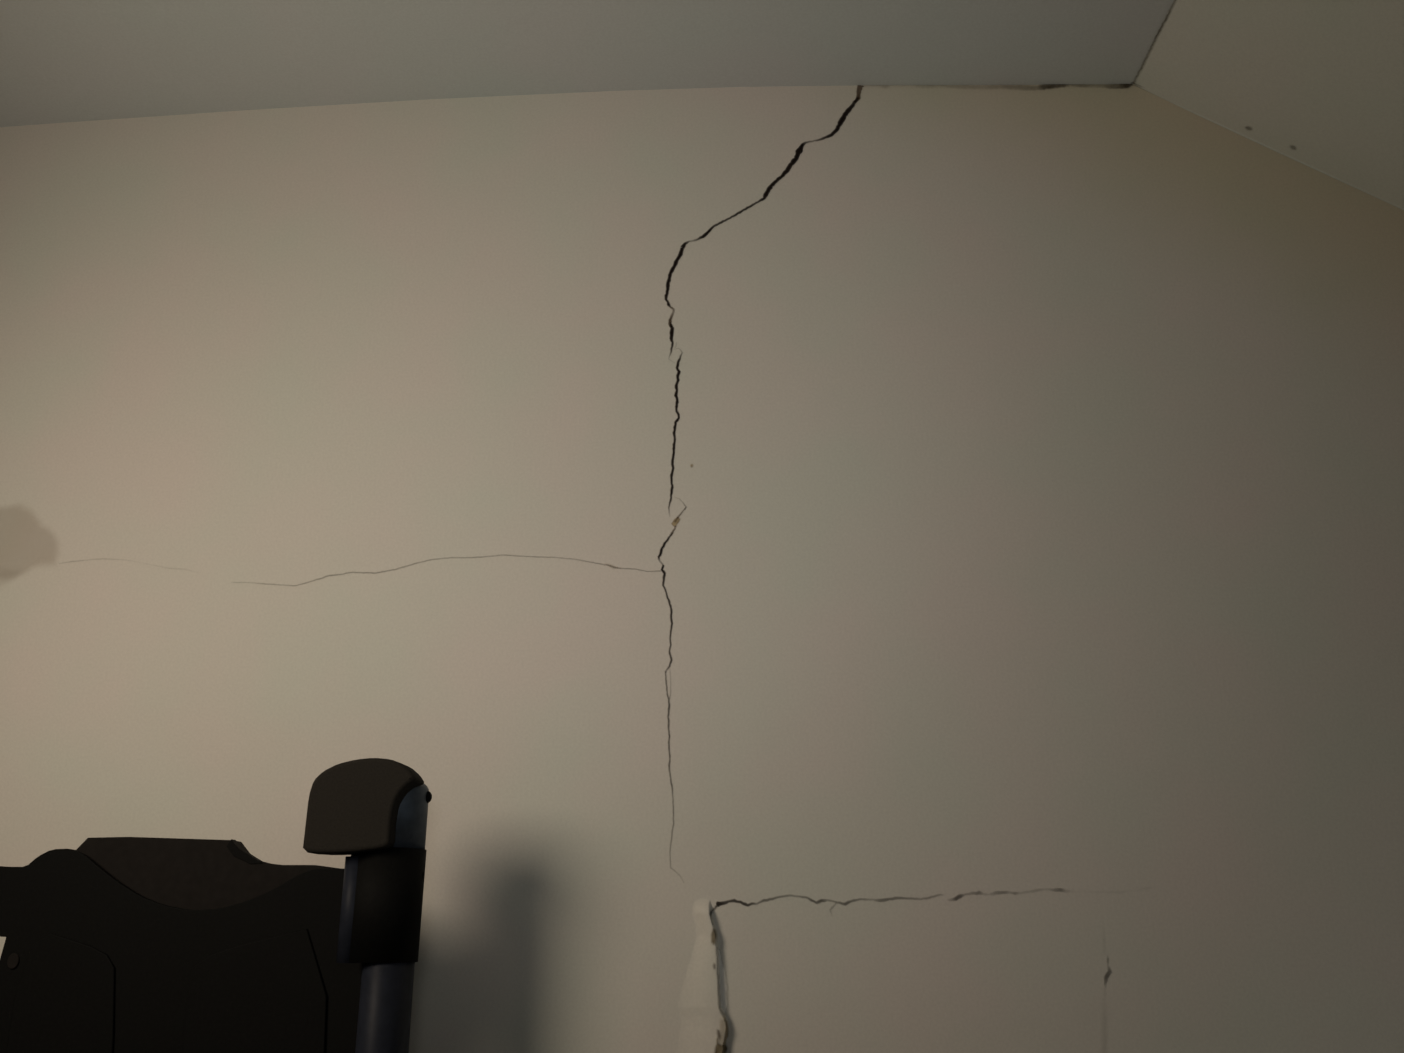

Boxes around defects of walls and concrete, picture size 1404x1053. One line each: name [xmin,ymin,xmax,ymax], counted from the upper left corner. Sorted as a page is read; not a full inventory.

crack [658,85,863,786]
crack [716,898,754,906]